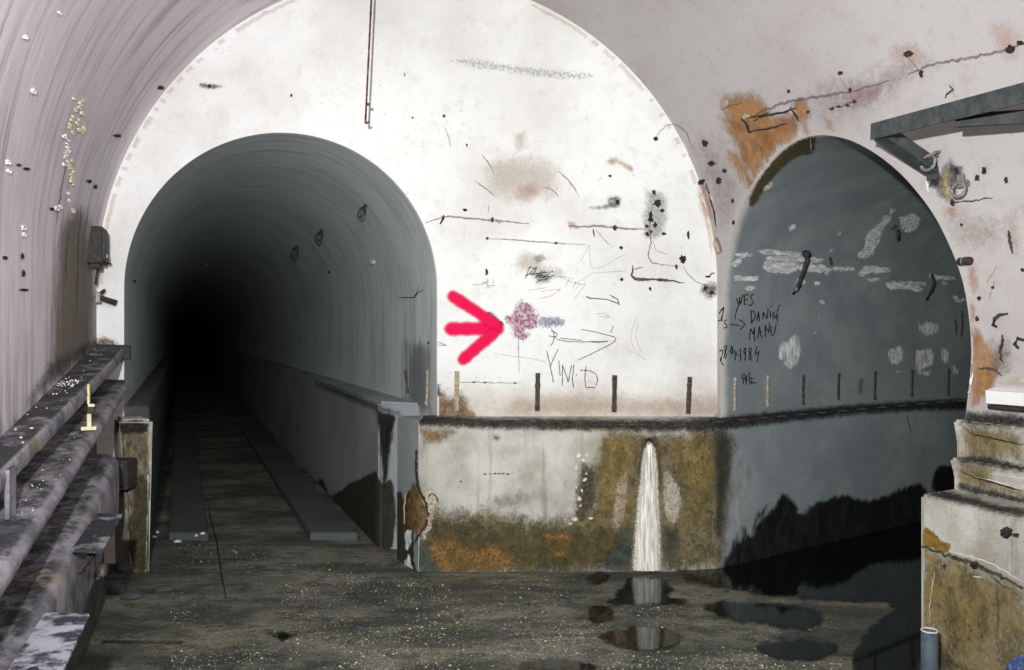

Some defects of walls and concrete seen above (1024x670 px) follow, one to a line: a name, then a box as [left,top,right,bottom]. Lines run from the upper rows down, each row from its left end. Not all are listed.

rust [721,90,809,185]
peeling [731,208,955,292]
rust [971,334,996,403]
water stain [315,380,414,566]
spalling [403,450,438,571]
water stain [419,399,1024,567]
rust [923,528,950,553]